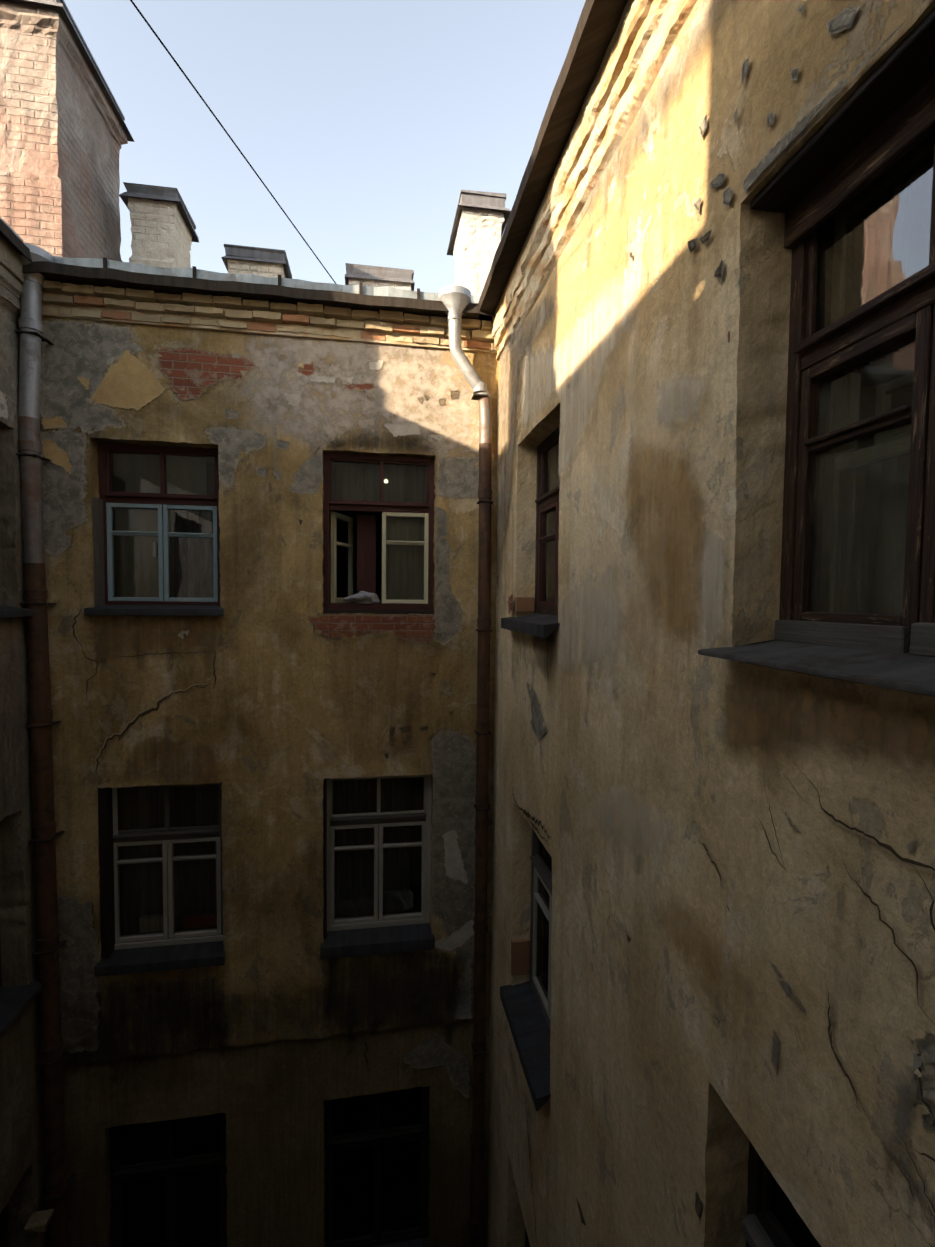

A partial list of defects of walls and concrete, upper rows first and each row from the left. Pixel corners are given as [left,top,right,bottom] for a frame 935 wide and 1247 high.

flaking render [693,0,925,214]
flaking render [40,318,257,558]
flaking render [296,359,383,391]
flaking render [385,422,443,441]
spalling [417,390,460,406]
spalling [308,456,479,646]
crack [72,605,217,787]
crack [756,761,935,1026]
spalling [913,1031,935,1133]